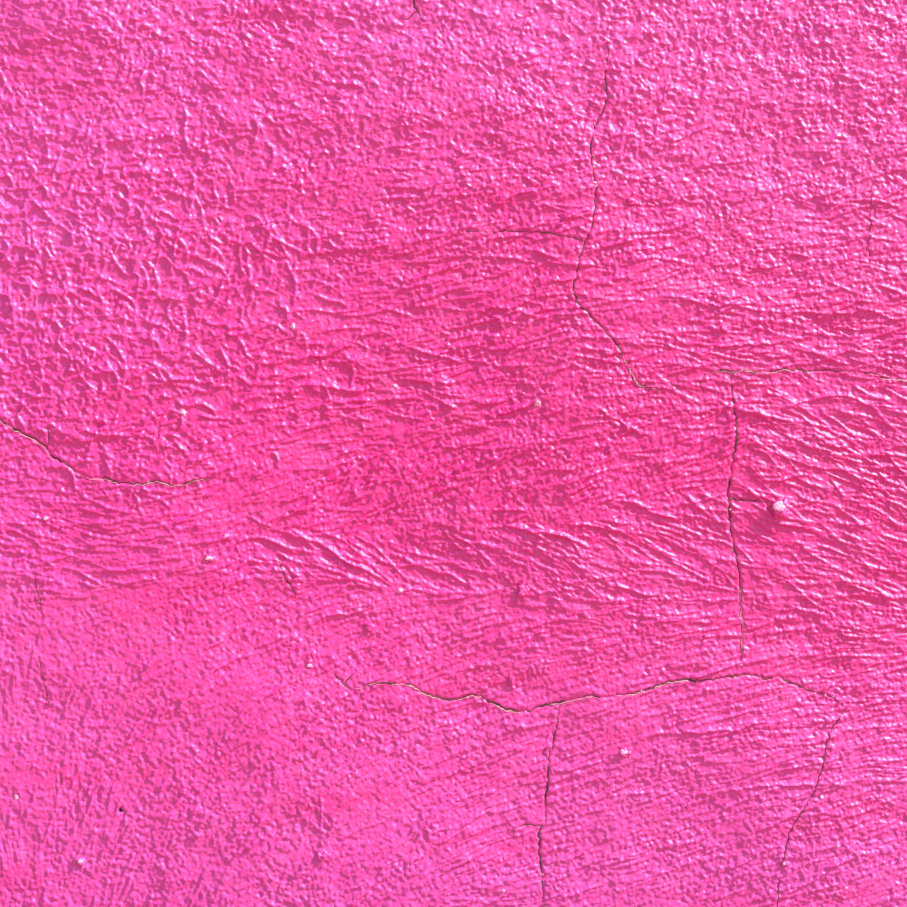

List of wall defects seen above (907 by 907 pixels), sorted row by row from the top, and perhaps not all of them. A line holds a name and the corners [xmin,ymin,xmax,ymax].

crack [404,0,424,22]
crack [462,34,678,389]
crack [0,407,213,488]
crack [335,368,907,907]